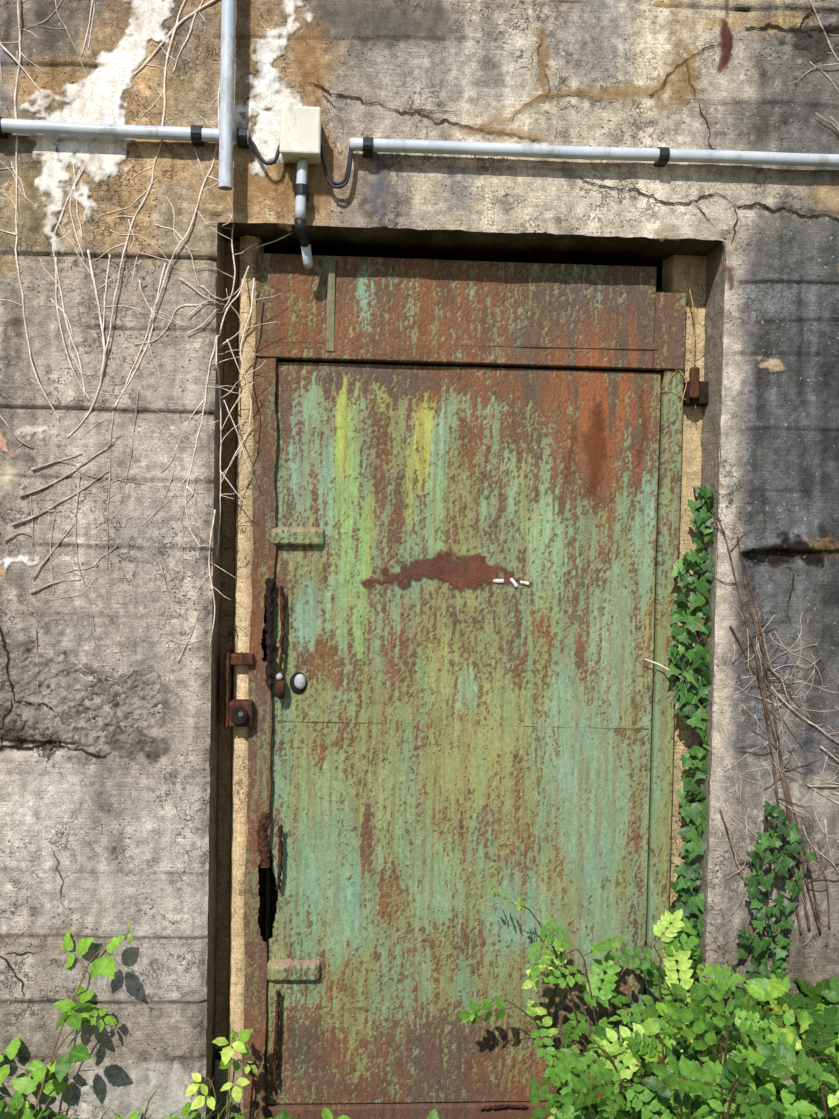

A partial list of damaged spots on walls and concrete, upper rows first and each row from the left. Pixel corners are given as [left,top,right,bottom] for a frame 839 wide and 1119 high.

efflorescence [21,0,174,253]
water stain [234,0,312,176]
crack [307,37,588,141]
corrosion [718,10,733,71]
crack [575,175,839,244]
corrosion [568,402,605,494]
corrosion [361,551,531,591]
corrosion [264,578,286,688]
crack [0,628,109,758]
corrosion [256,812,283,890]
corrosion [273,989,281,1086]